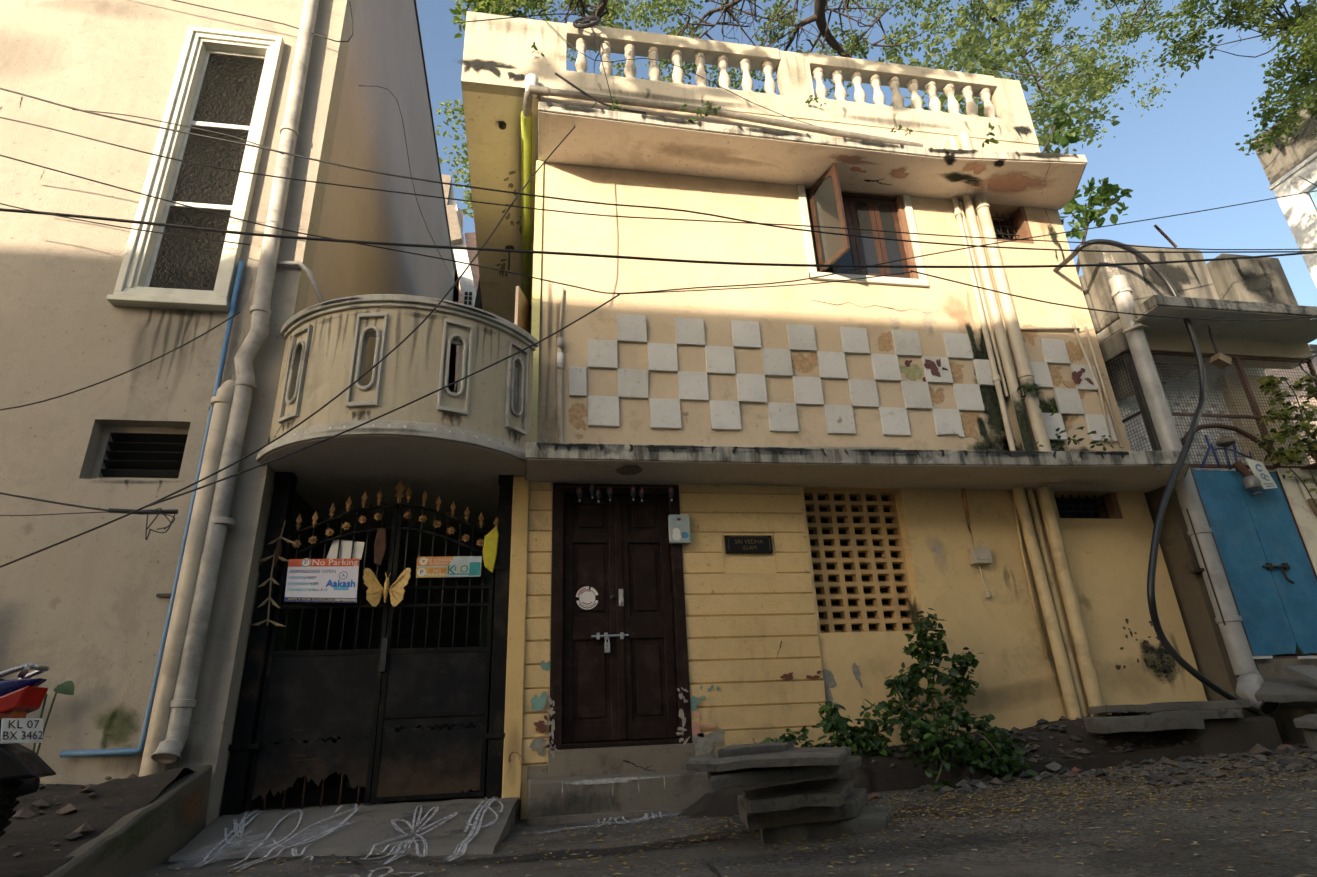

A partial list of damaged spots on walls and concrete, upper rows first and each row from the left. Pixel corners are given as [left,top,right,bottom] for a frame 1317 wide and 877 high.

water stain [459,59,525,81]
peeling [838,155,869,173]
peeling [963,163,1043,192]
peeling [878,332,894,352]
peeling [899,359,964,406]
water stain [1140,643,1177,681]
peeling [529,691,562,758]
peeling [676,685,725,756]